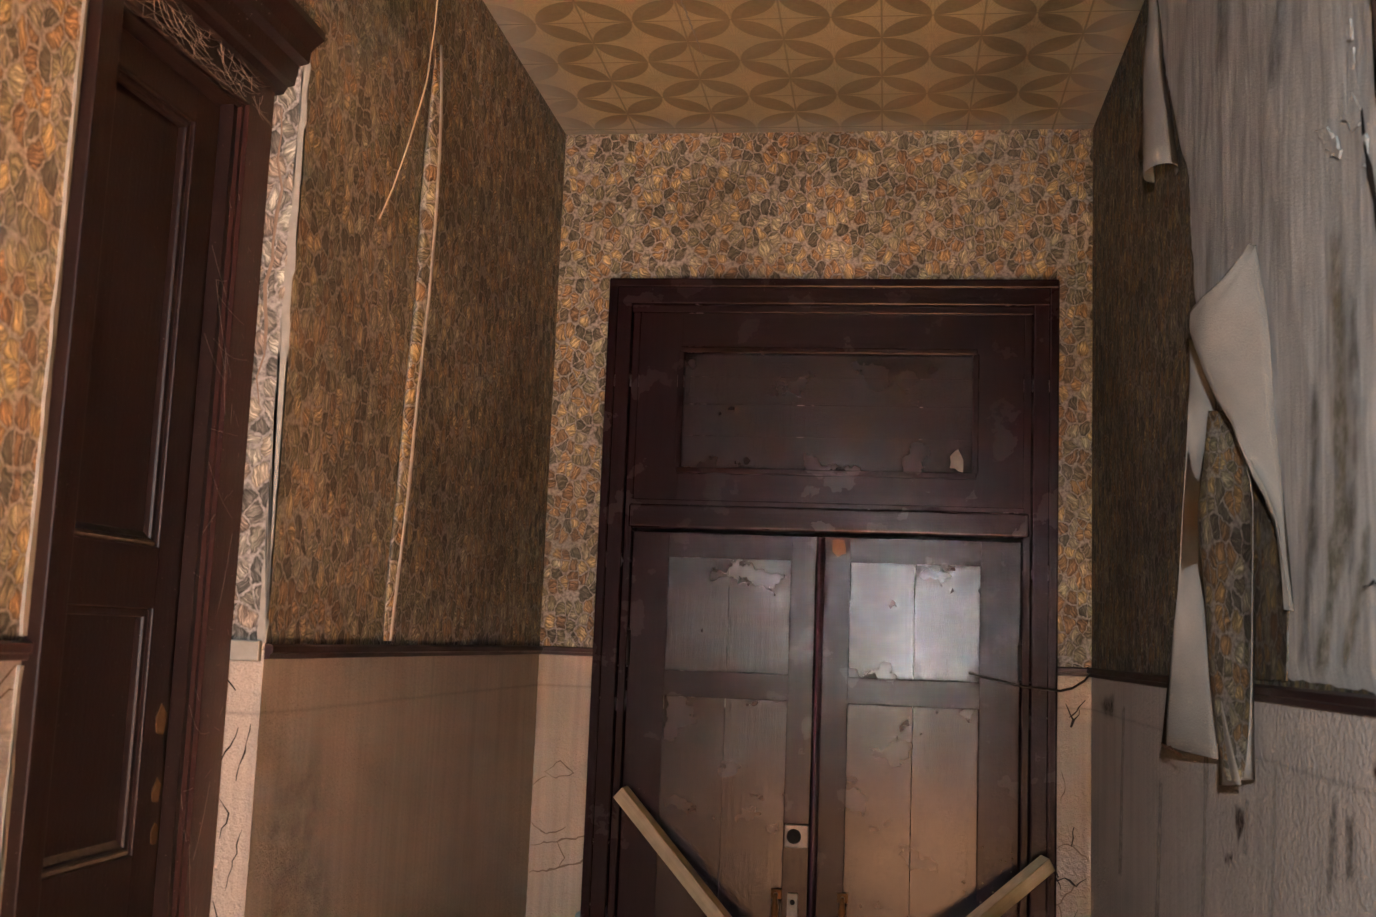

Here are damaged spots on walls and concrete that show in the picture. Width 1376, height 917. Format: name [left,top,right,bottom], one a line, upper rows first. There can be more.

peeling [1158,0,1376,694]
crack [1066,701,1085,728]
crack [534,760,574,784]
crack [529,822,584,873]
crack [1056,772,1089,917]